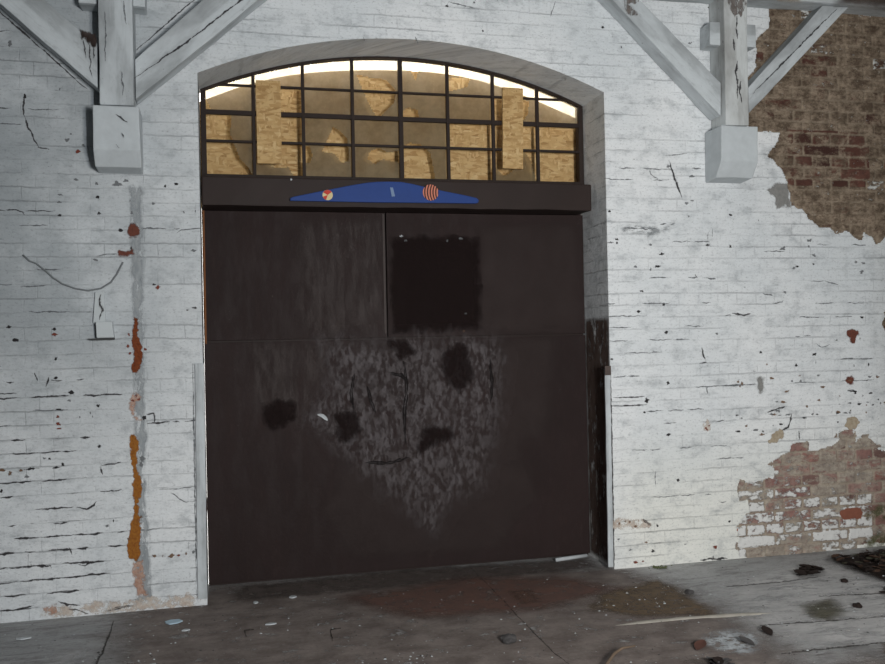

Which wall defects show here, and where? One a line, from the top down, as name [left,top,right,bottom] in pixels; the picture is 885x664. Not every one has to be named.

peeling [728,0,747,50]
flaking render [735,9,812,102]
flaking render [748,14,885,246]
corrosion [126,317,147,373]
corrosion [129,394,141,420]
peeling [736,364,802,443]
corrosion [127,434,146,561]
flaking render [728,380,885,558]